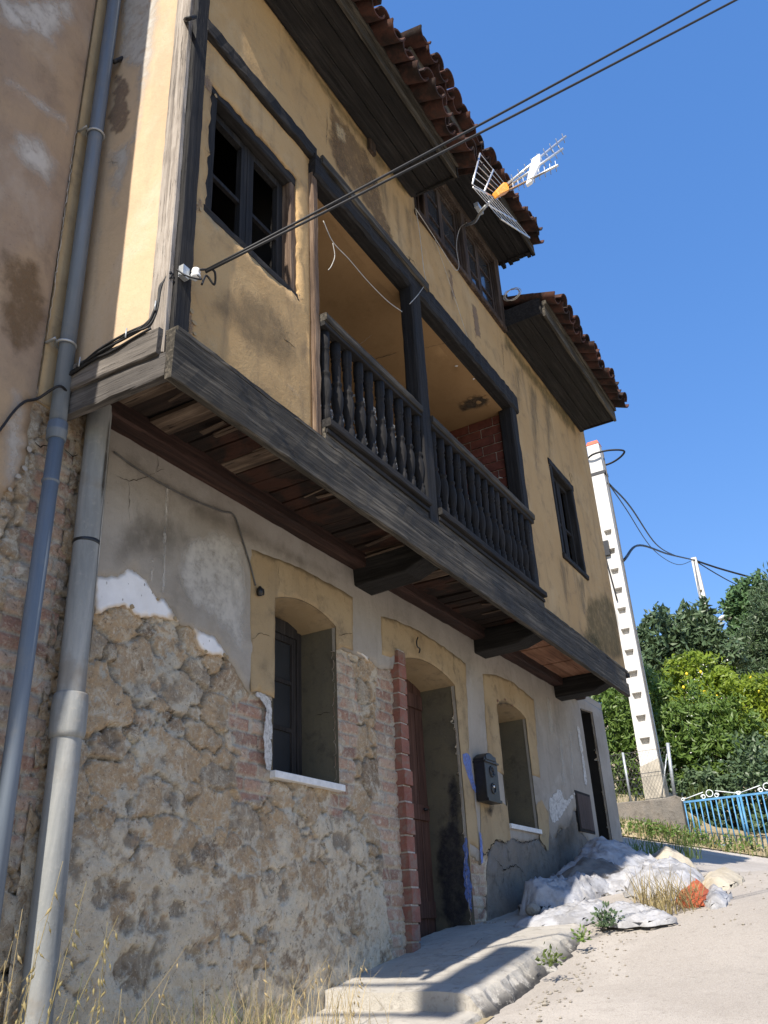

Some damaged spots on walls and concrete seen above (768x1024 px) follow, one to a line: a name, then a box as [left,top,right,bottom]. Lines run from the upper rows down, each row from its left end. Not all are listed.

leakage [5,262,44,348]
flaking render [93,569,179,622]
flaking render [193,627,229,659]
flaking render [256,692,273,771]
flaking render [549,789,575,823]
crack [483,839,538,880]